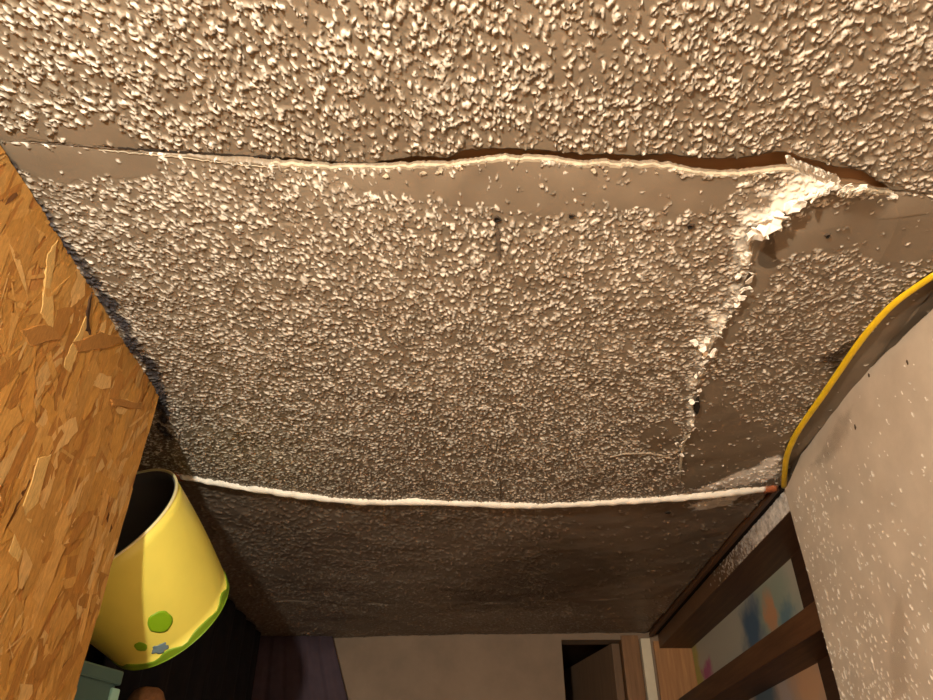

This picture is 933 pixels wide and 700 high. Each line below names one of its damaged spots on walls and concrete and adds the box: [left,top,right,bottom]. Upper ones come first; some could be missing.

crack [29,142,799,182]
spalling [690,191,933,358]
spalling [636,376,784,490]